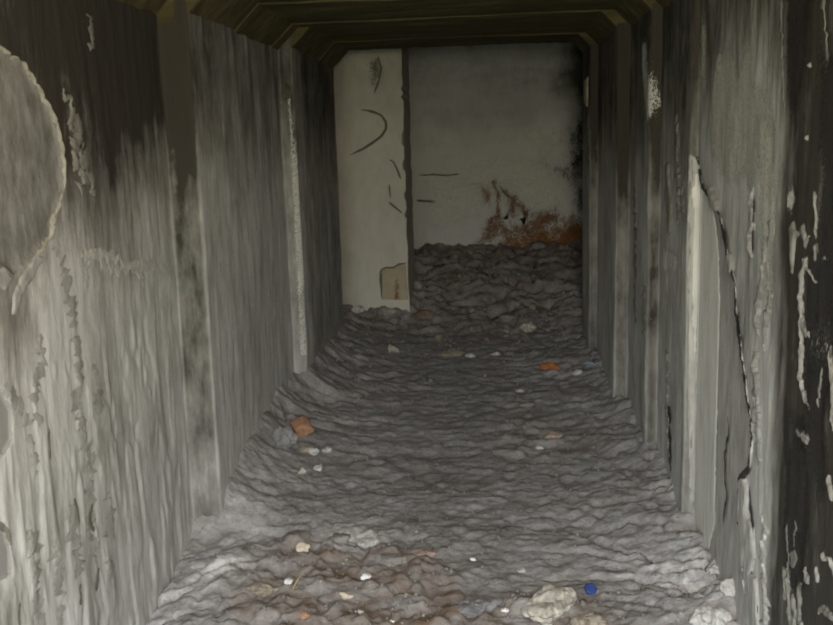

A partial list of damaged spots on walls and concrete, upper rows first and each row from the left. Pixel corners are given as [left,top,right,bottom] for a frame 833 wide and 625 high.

peeling [86,14,95,51]
flaking render [0,45,116,625]
damp [419,62,583,238]
rust [472,179,583,249]
damp [779,0,833,597]
peeling [787,186,833,431]
peeling [782,516,833,625]